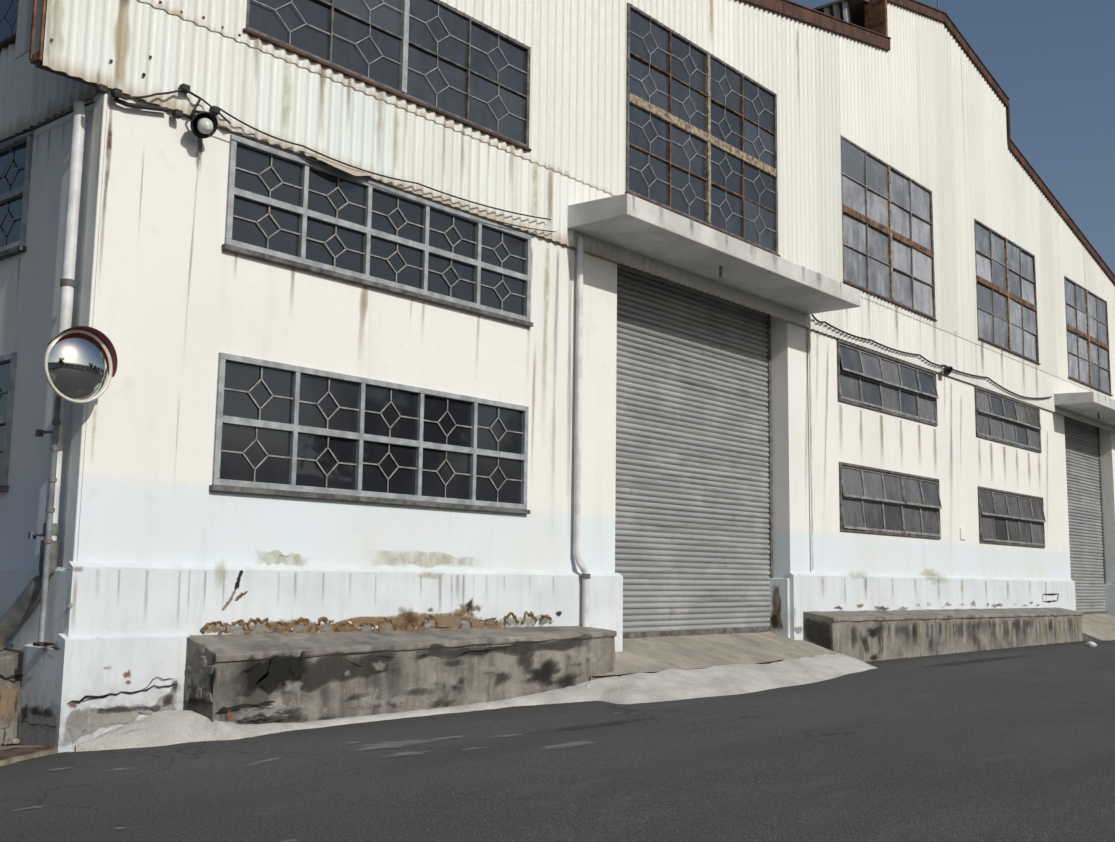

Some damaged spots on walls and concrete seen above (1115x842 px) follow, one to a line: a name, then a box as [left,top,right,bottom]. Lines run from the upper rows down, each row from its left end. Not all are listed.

rust [117,0,128,79]
crack [223,570,248,610]
peeling [200,599,562,635]
flaking render [771,586,783,628]
crack [67,676,173,704]